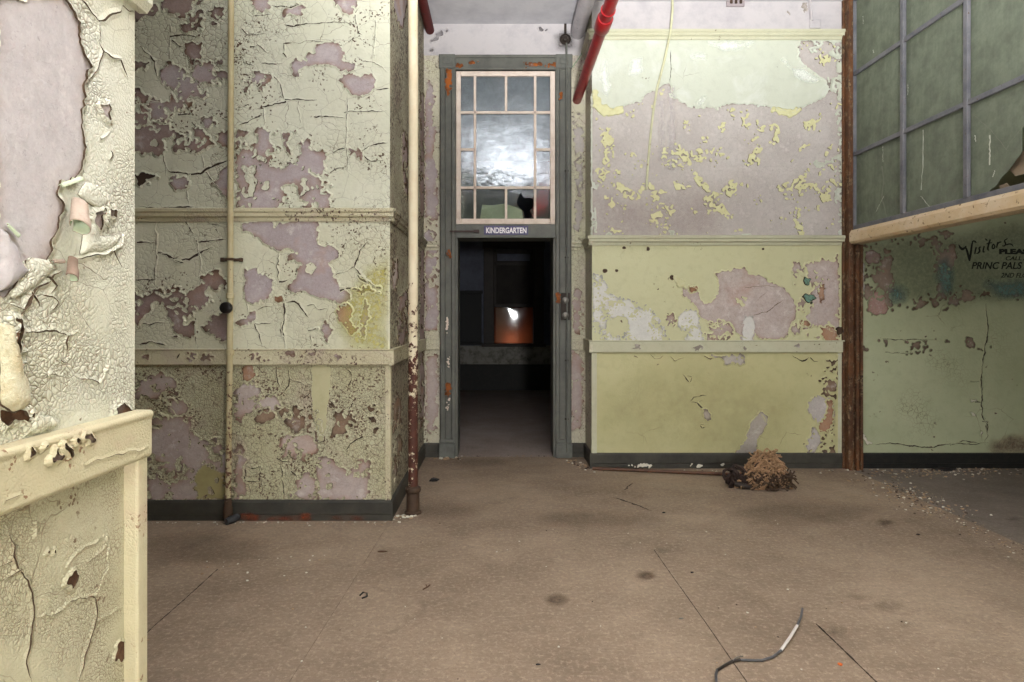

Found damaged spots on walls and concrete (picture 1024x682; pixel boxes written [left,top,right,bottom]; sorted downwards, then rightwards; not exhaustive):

crack [79,0,198,128]
peeling [135,0,334,208]
crack [222,3,389,174]
peeling [571,40,842,235]
peeling [0,406,97,467]
crack [85,444,162,478]
peeling [110,352,249,500]
peeling [135,60,479,435]
peeling [232,351,403,500]
peeling [681,253,842,367]
crack [872,300,992,449]
crack [0,491,123,682]